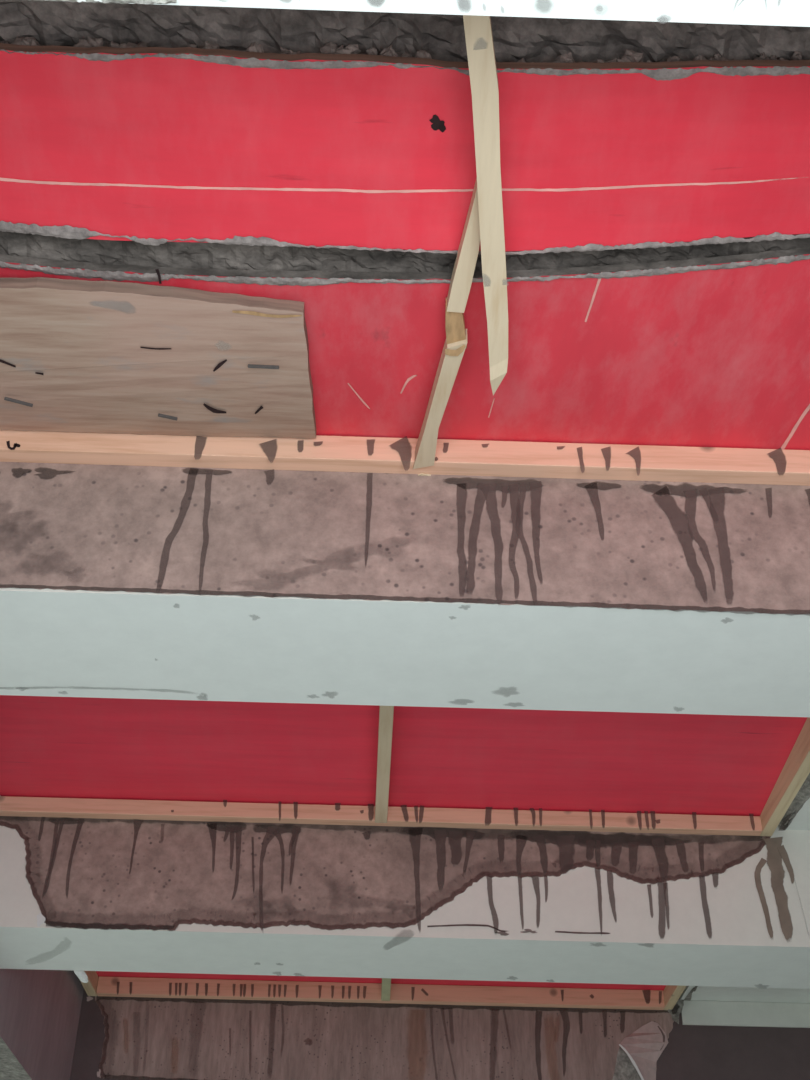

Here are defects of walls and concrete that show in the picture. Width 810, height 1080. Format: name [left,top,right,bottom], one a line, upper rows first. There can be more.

spalling [0,0,468,62]
spalling [490,16,810,63]
spalling [0,231,457,273]
water stain [157,468,232,591]
peeling [0,462,810,615]
water stain [445,477,542,603]
water stain [643,484,745,603]
water stain [207,821,301,930]
peeling [0,773,810,931]
water stain [498,830,718,938]
water stain [754,837,794,940]
peeling [87,986,698,1080]